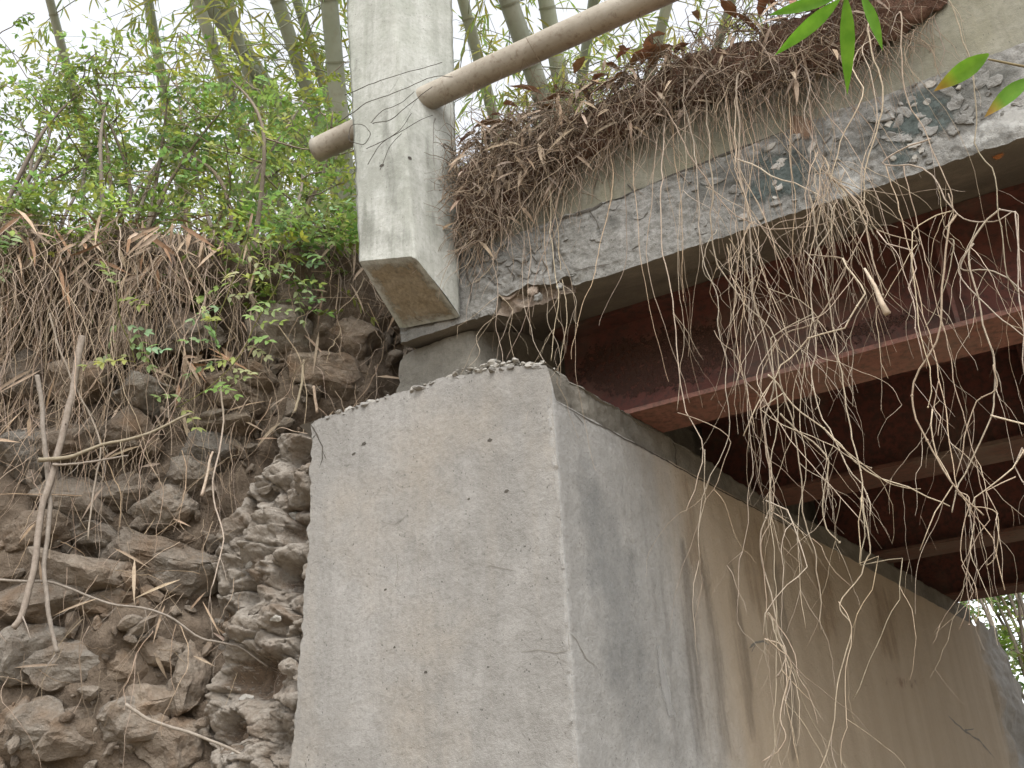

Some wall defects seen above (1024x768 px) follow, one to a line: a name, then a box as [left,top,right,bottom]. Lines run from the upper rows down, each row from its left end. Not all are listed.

corrosion [573,319,740,399]
corrosion [810,311,915,349]